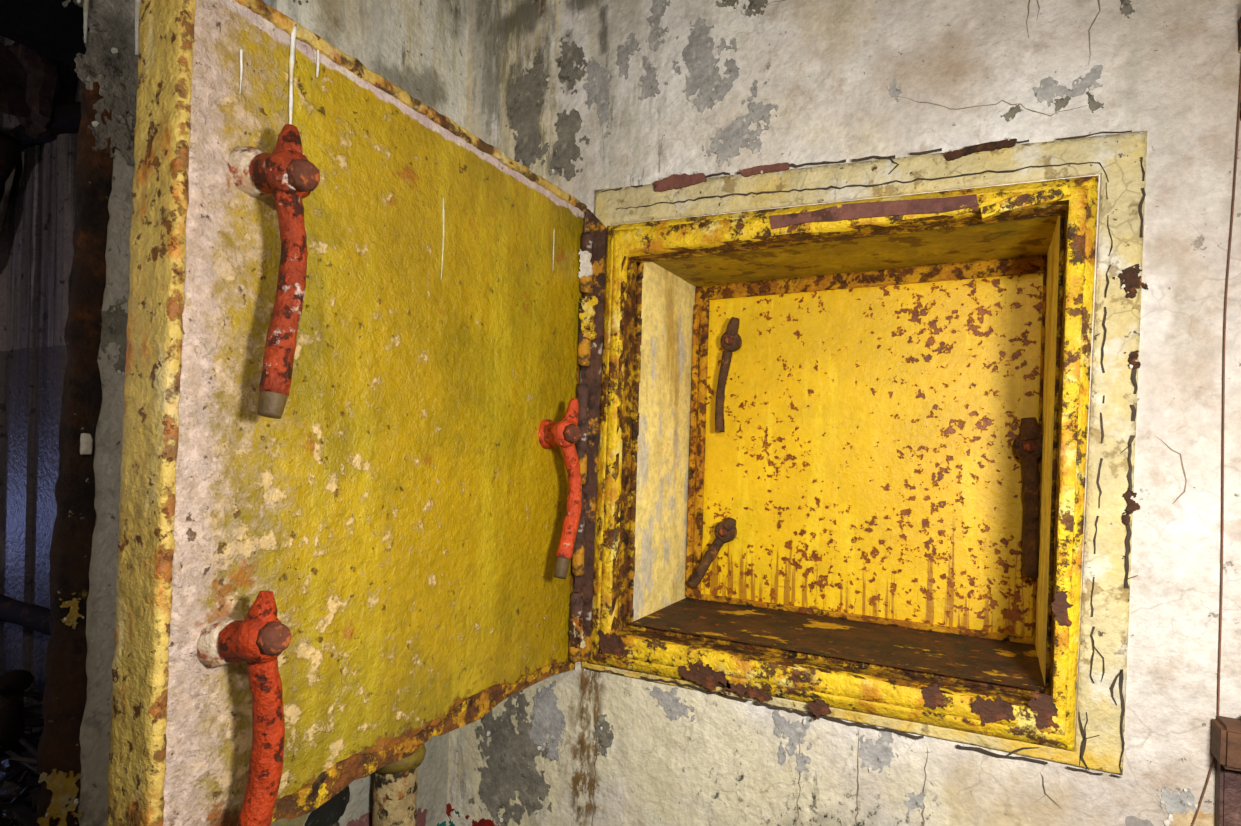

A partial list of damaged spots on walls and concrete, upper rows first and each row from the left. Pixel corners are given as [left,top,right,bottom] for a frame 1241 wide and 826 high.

peeling [716,0,768,17]
peeling [505,0,740,181]
peeling [702,79,790,177]
peeling [944,137,1017,161]
peeling [1000,103,1023,122]
peeling [1032,65,1104,113]
peeling [653,172,707,192]
rust [271,661,600,825]
peeling [416,680,566,826]
peeling [772,709,812,773]
peeling [851,730,907,775]
peeling [1125,786,1215,826]